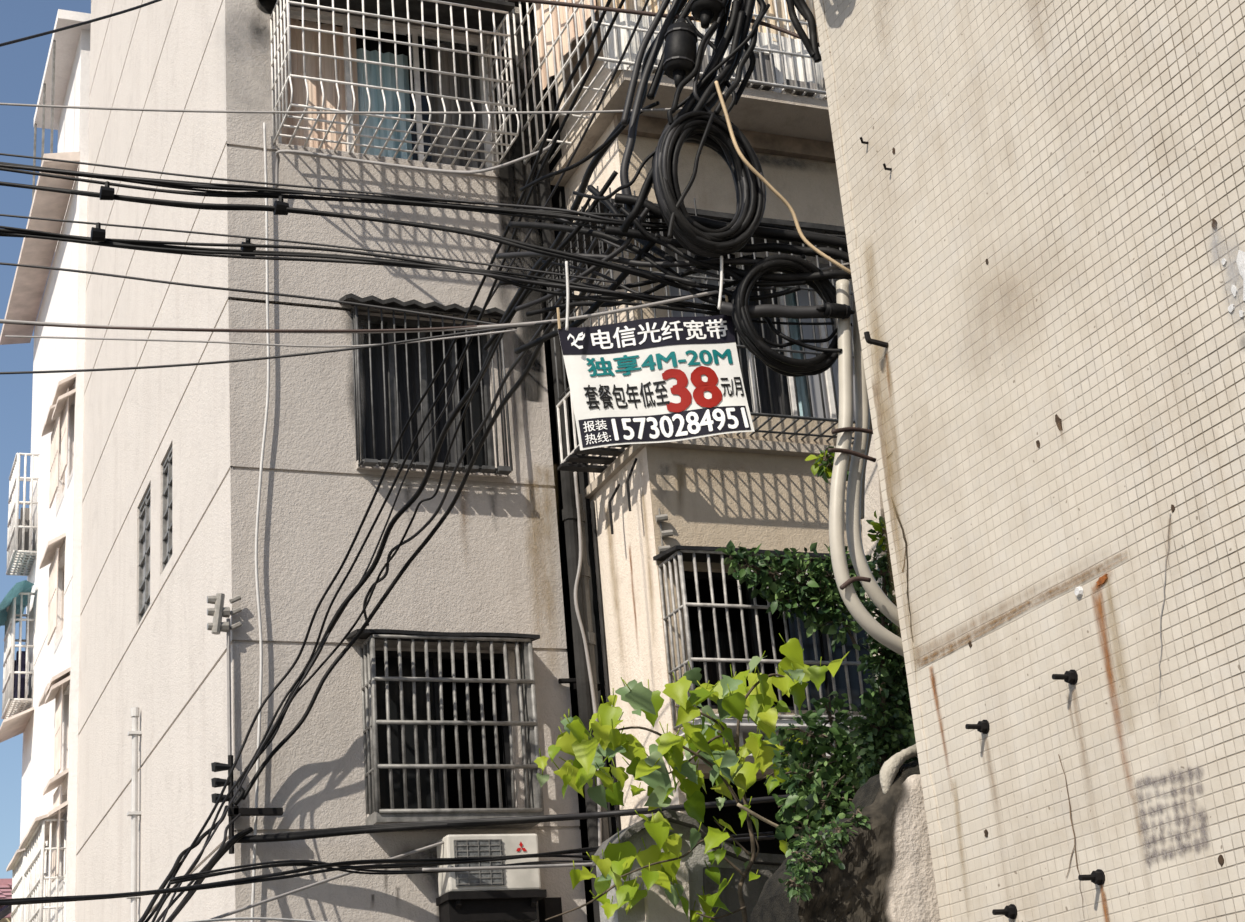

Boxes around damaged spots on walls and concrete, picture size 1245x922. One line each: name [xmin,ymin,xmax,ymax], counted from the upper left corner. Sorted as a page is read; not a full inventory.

rust [921,556,1121,746]